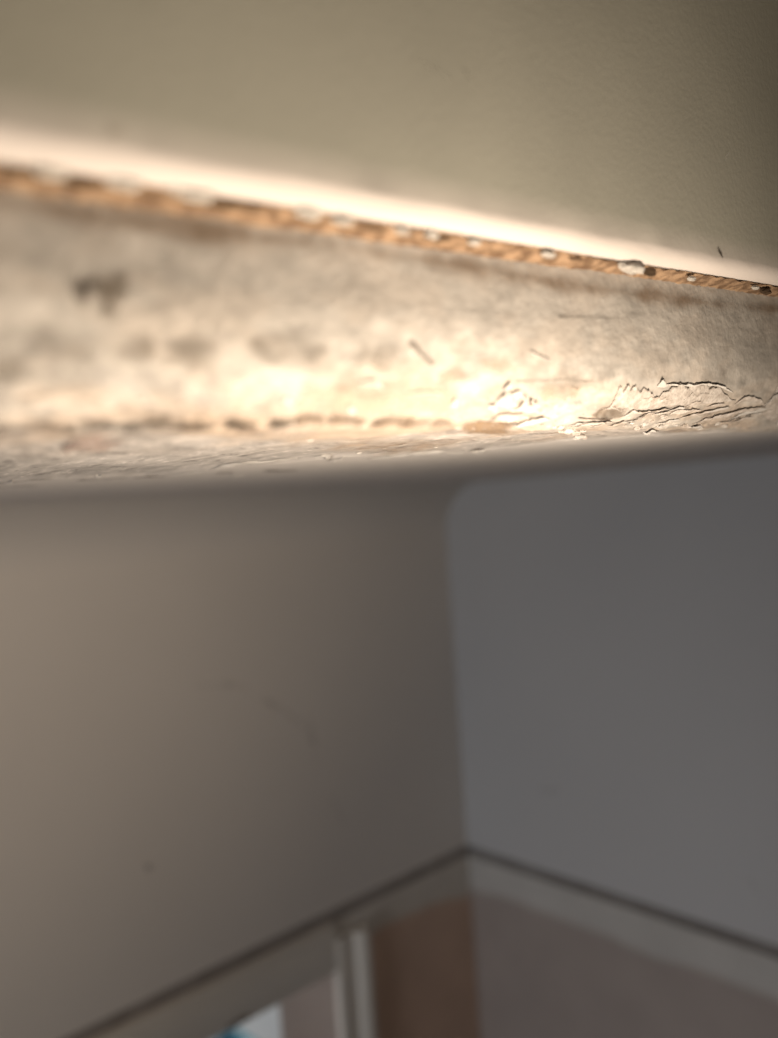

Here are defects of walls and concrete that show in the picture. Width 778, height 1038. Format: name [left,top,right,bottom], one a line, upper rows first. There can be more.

spalling [0,163,778,297]
water stain [183,394,454,449]
peeling [458,384,551,434]
peeling [570,380,778,433]
spalling [313,443,486,463]